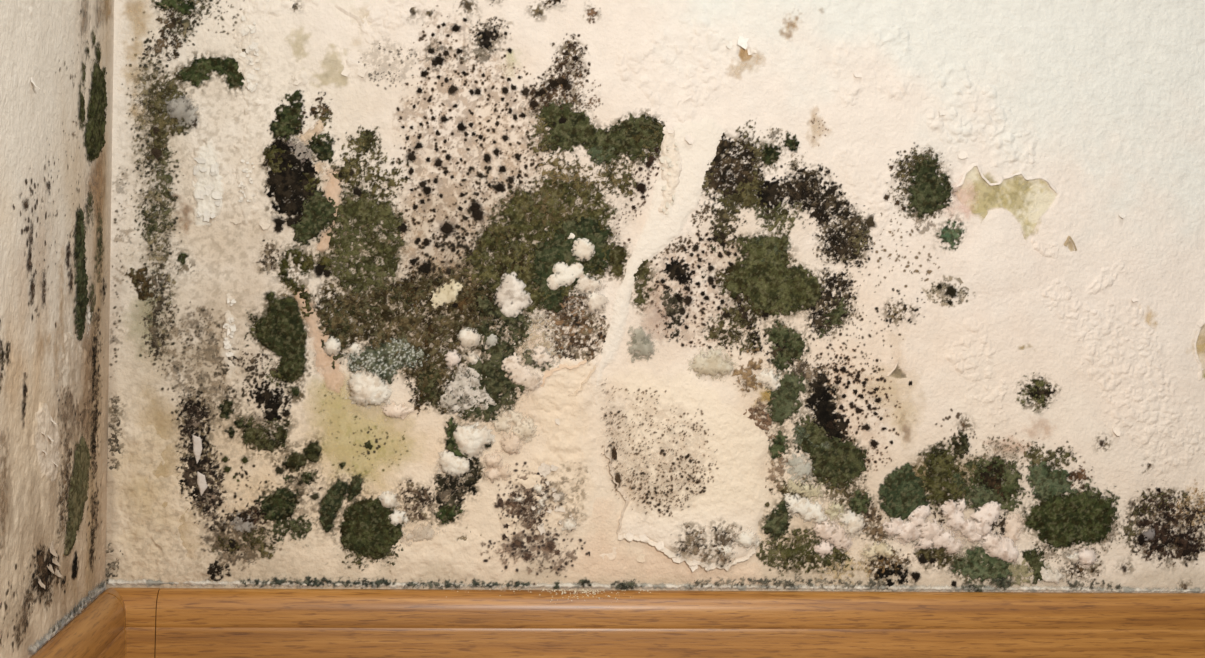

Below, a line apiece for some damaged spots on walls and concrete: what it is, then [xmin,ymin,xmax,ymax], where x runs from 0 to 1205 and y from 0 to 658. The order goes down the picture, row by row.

spalling [954,150,1059,237]
damp [0,0,592,651]
damp [495,34,1205,592]
spalling [1193,311,1205,380]
peeling [388,353,769,590]